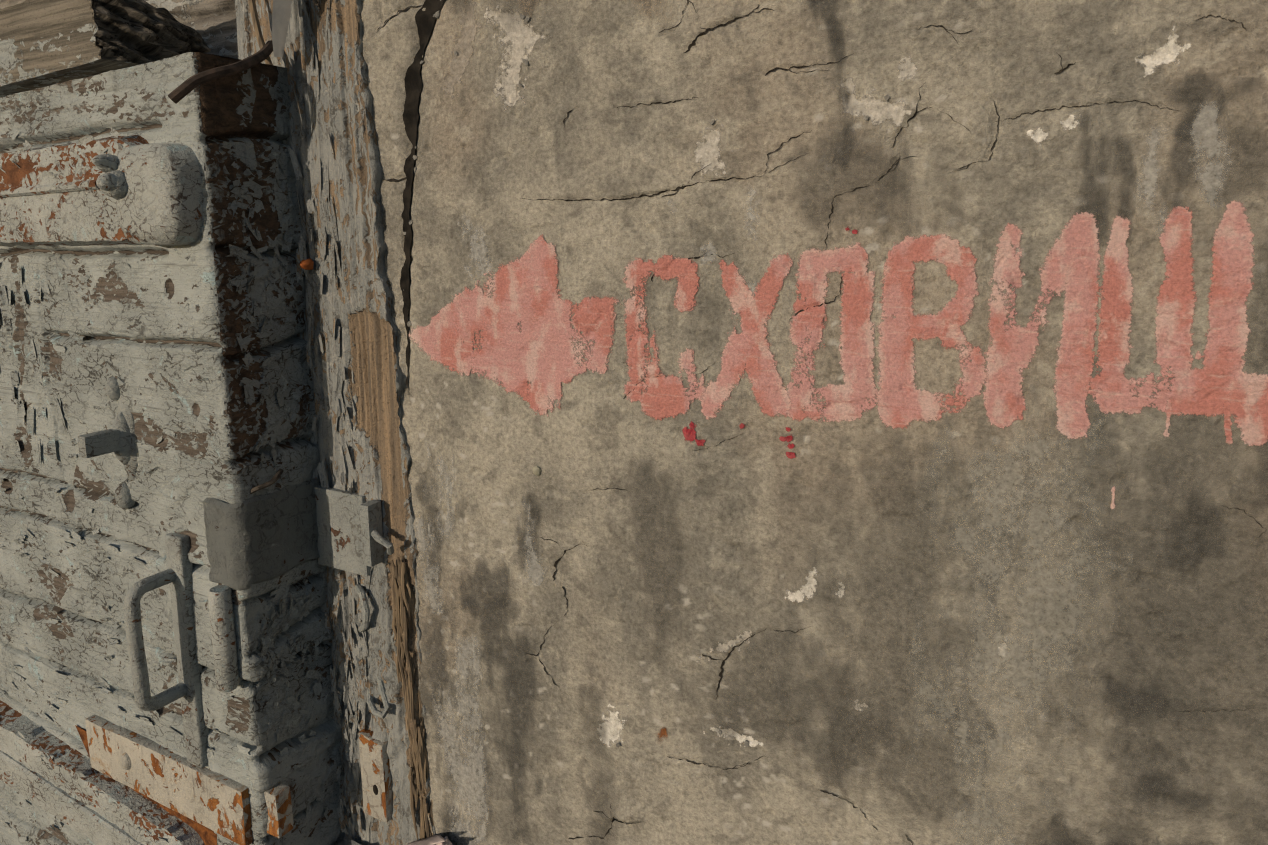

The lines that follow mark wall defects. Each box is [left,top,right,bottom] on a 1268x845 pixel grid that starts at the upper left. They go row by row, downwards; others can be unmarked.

peeling [484,4,551,111]
crack [659,0,777,53]
peeling [1135,27,1191,78]
crack [375,0,445,395]
crack [523,130,812,201]
crack [789,82,1182,320]
leakage [1082,133,1158,228]
leakage [1172,78,1221,203]
peeling [222,44,355,494]
peeling [785,567,817,603]
peeling [260,568,383,845]
leakage [416,461,534,845]